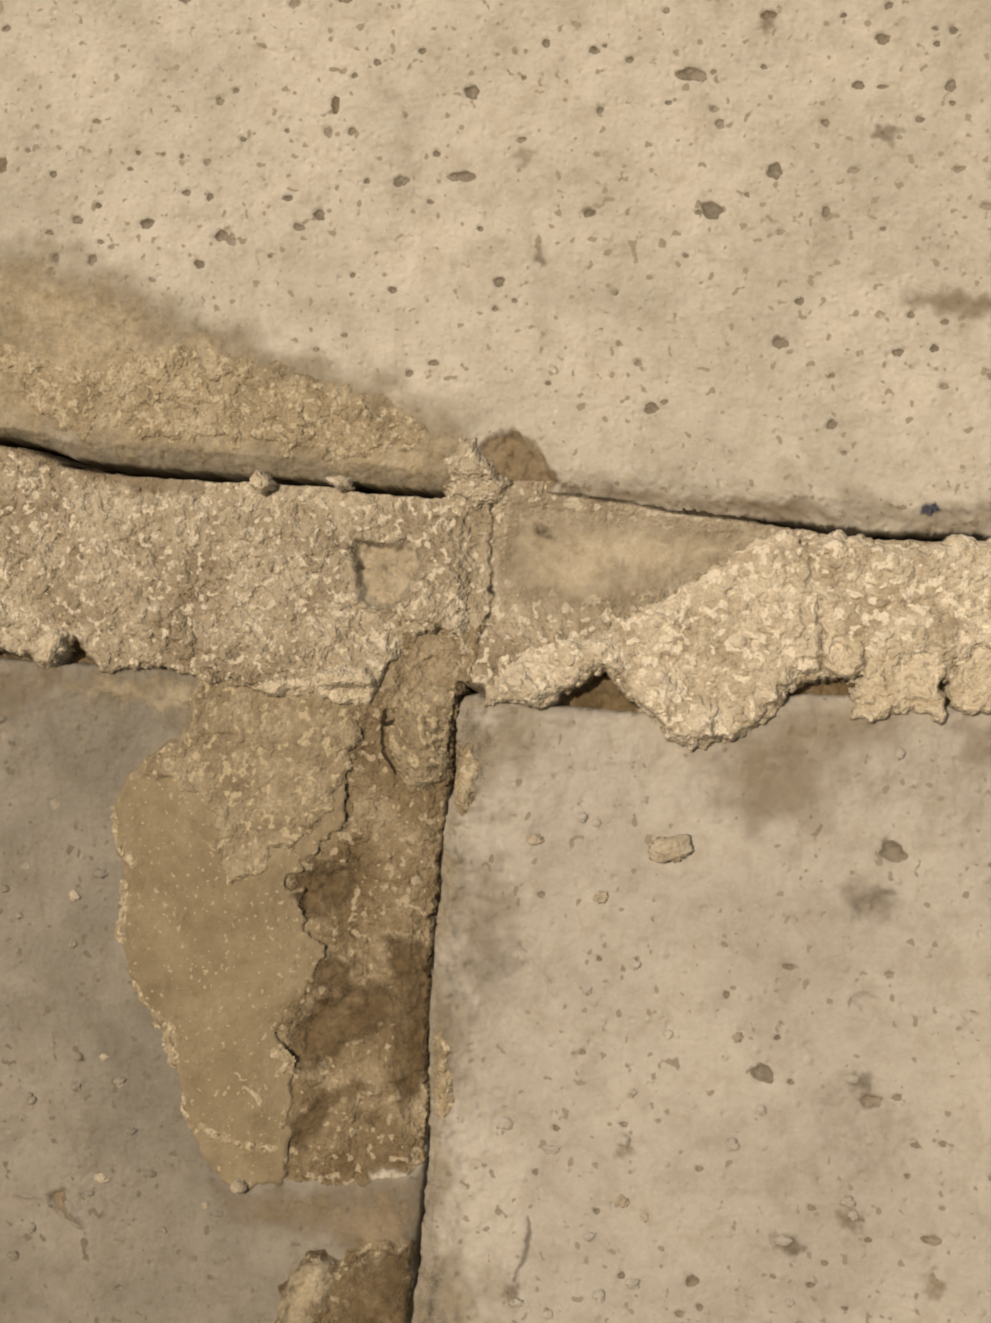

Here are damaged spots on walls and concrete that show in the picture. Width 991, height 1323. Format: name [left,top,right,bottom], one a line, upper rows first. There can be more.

crack [34,450,234,483]
crack [560,493,769,525]
crack [483,503,494,623]
crack [380,708,397,775]
spalling [275,624,482,1187]